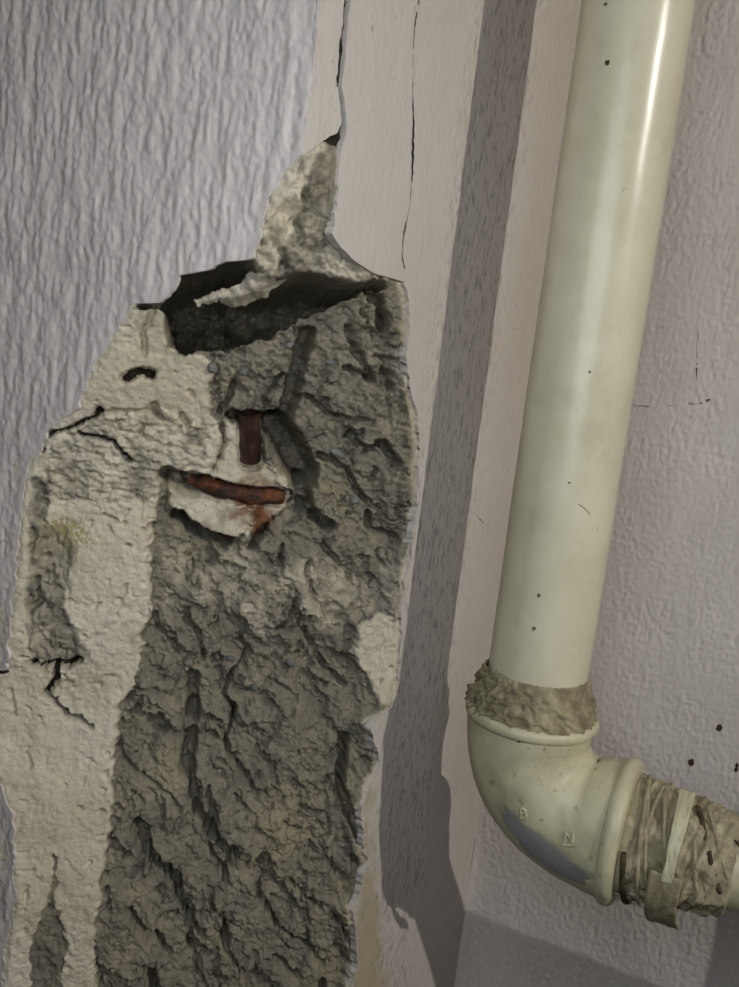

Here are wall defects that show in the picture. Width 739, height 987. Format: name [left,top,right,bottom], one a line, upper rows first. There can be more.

crack [336,0,346,87]
crack [322,126,341,147]
crack [402,82,415,269]
corrosion [236,500,270,534]
spalling [0,137,417,987]